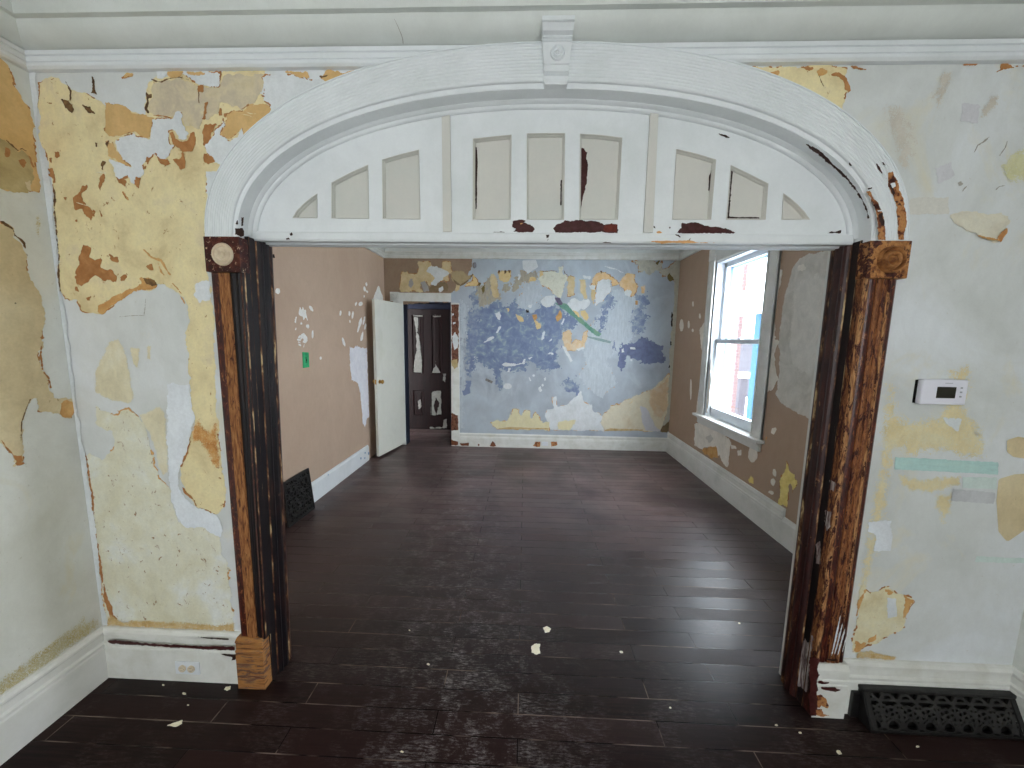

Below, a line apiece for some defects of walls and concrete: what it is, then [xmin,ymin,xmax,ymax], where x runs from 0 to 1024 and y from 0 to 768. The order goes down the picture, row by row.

peeling [803,66,866,91]
peeling [104,70,354,195]
spalling [806,144,885,226]
spalling [500,219,618,243]
peeling [516,266,568,311]
peeling [413,304,496,447]
peeling [533,279,670,447]
peeling [694,422,731,467]
peeling [778,461,797,507]
peeling [885,589,914,619]
spalling [108,637,236,660]
peeling [854,635,876,652]